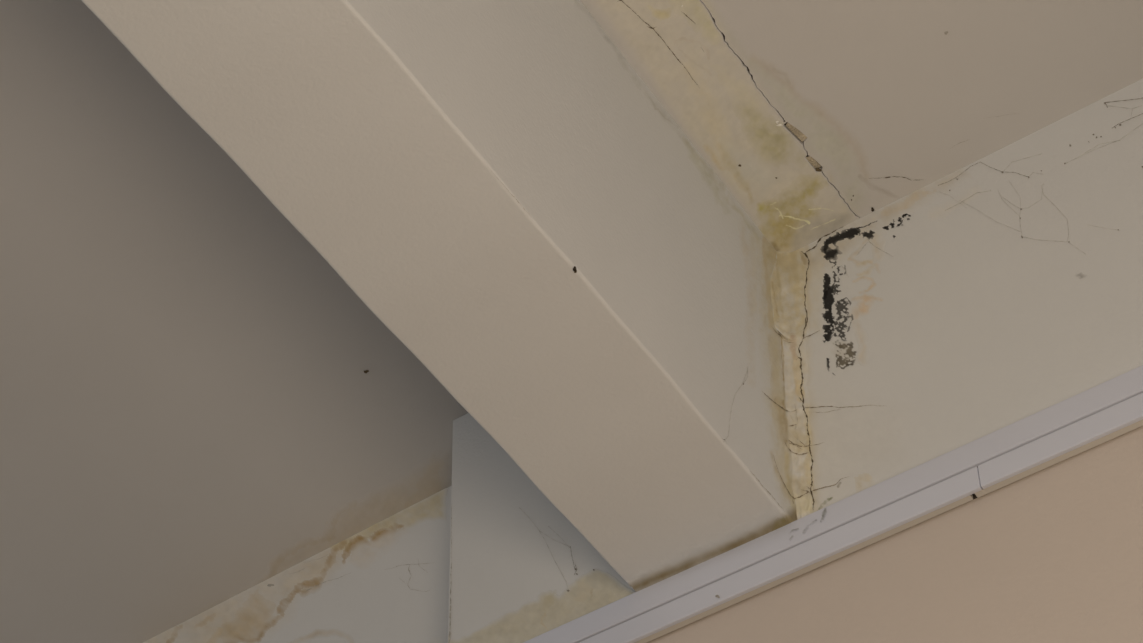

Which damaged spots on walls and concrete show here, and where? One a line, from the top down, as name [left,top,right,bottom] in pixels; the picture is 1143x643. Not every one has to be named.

crack [617,0,725,83]
water stain [580,0,984,519]
crack [798,227,842,506]
water stain [143,446,452,643]